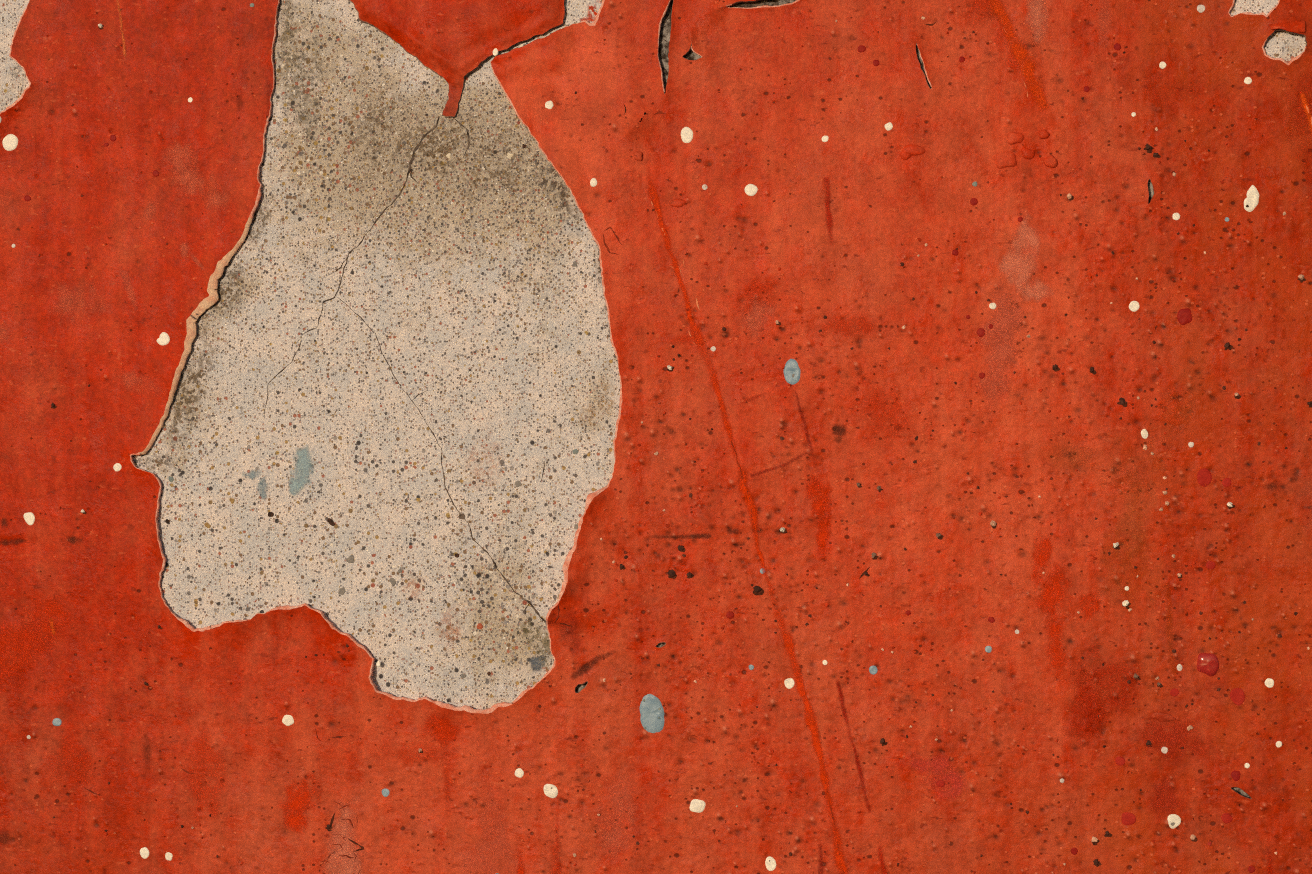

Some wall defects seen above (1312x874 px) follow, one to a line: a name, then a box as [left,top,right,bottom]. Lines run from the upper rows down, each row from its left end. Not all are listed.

peeling [0,0,31,114]
peeling [1228,0,1307,65]
peeling [130,0,622,714]
crack [264,117,572,627]